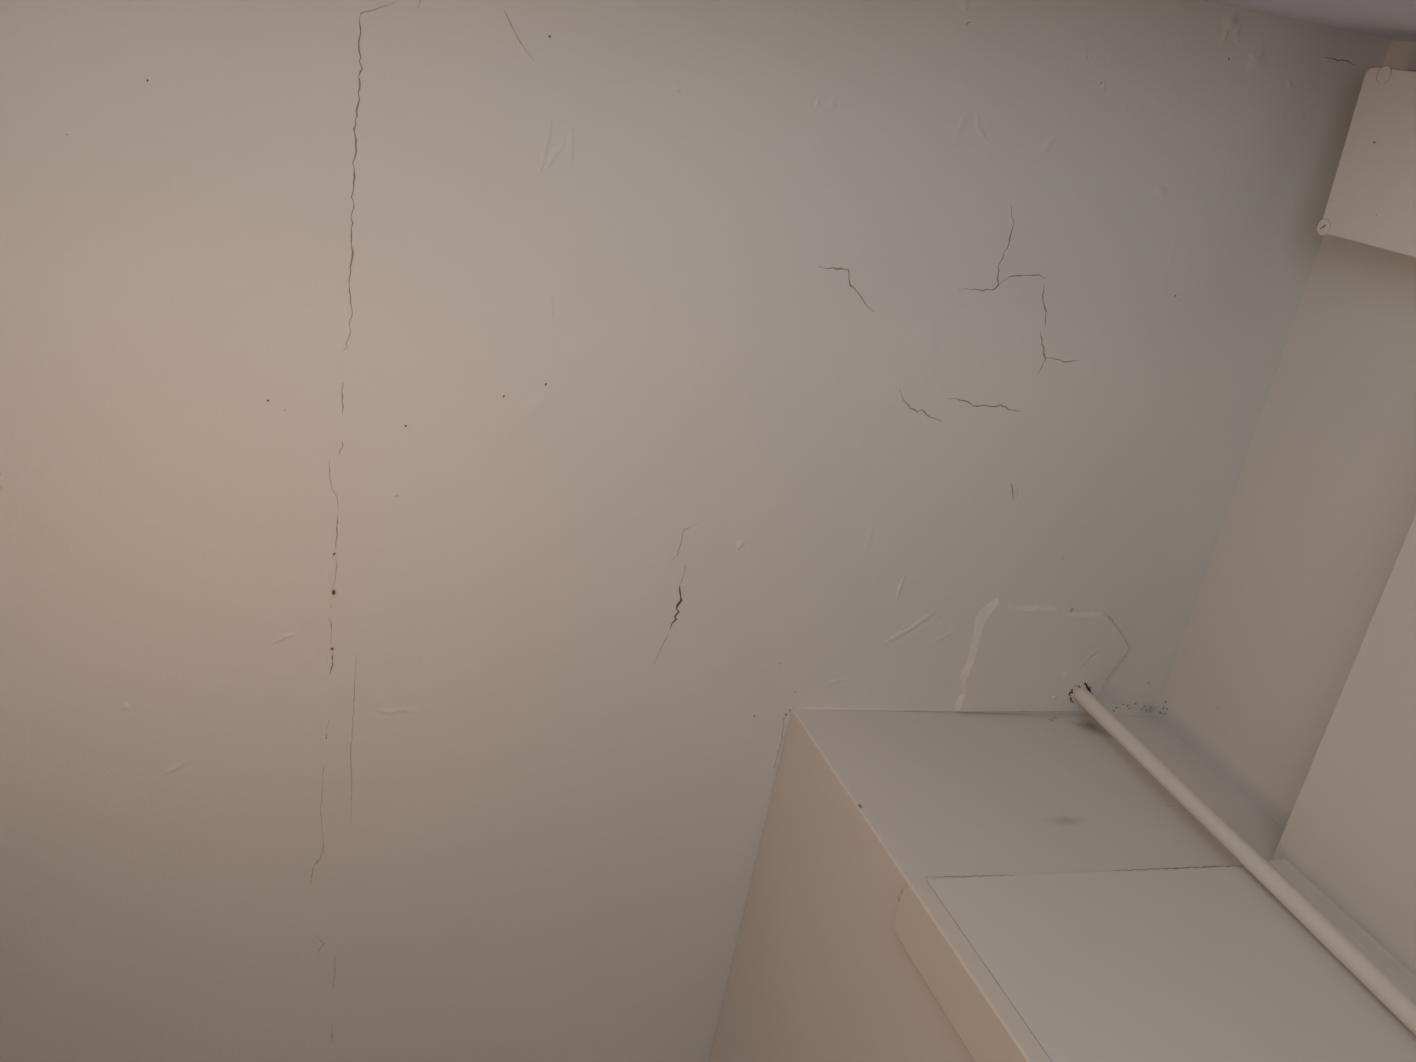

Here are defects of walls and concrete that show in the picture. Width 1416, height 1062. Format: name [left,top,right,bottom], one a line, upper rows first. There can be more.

crack [346,0,421,345]
crack [823,267,874,312]
crack [959,208,1078,373]
crack [899,389,1016,421]
crack [654,524,696,663]
spalling [1065,679,1094,705]